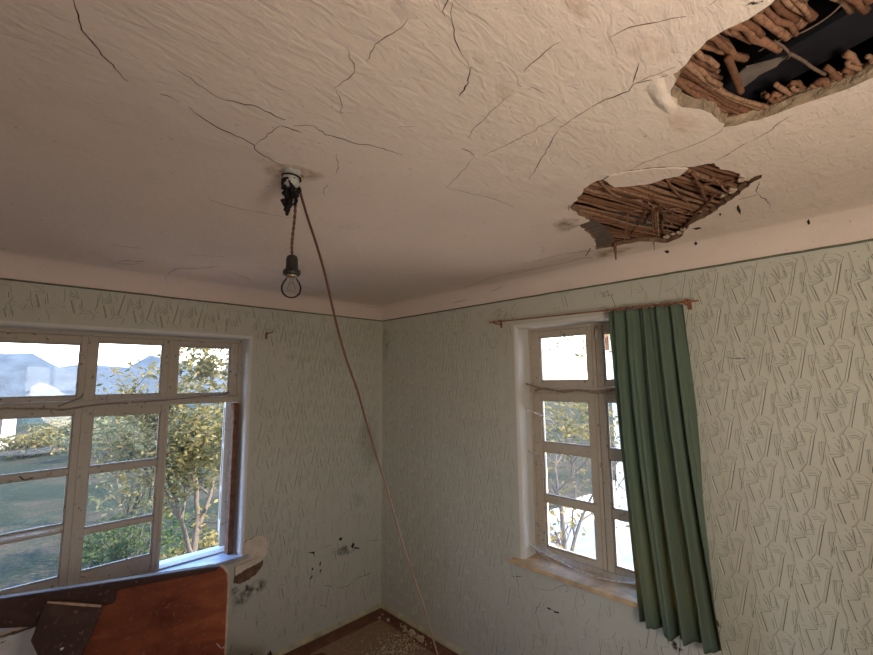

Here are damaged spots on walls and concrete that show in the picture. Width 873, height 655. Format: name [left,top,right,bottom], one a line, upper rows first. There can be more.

crack [73,0,127,81]
crack [161,70,401,195]
crack [335,19,408,111]
crack [442,0,482,96]
crack [449,42,674,207]
crack [611,16,686,37]
spalling [671,62,873,127]
spalling [570,173,762,253]
spalling [233,536,268,584]
peeling [0,627,37,655]